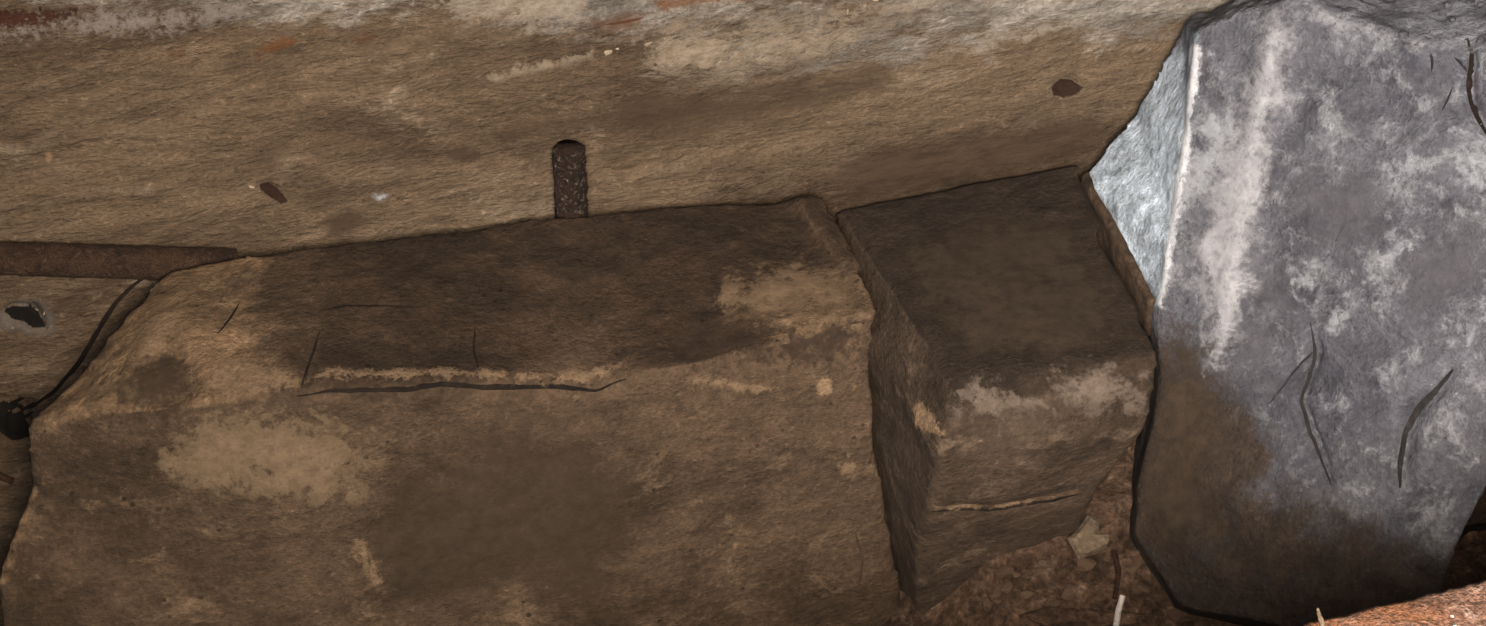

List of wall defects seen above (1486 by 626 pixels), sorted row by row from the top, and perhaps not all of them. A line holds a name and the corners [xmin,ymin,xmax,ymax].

crack [1430,38,1486,135]
crack [15,280,142,414]
crack [217,302,240,334]
crack [297,305,626,397]
crack [1269,322,1332,485]
crack [1397,369,1454,488]